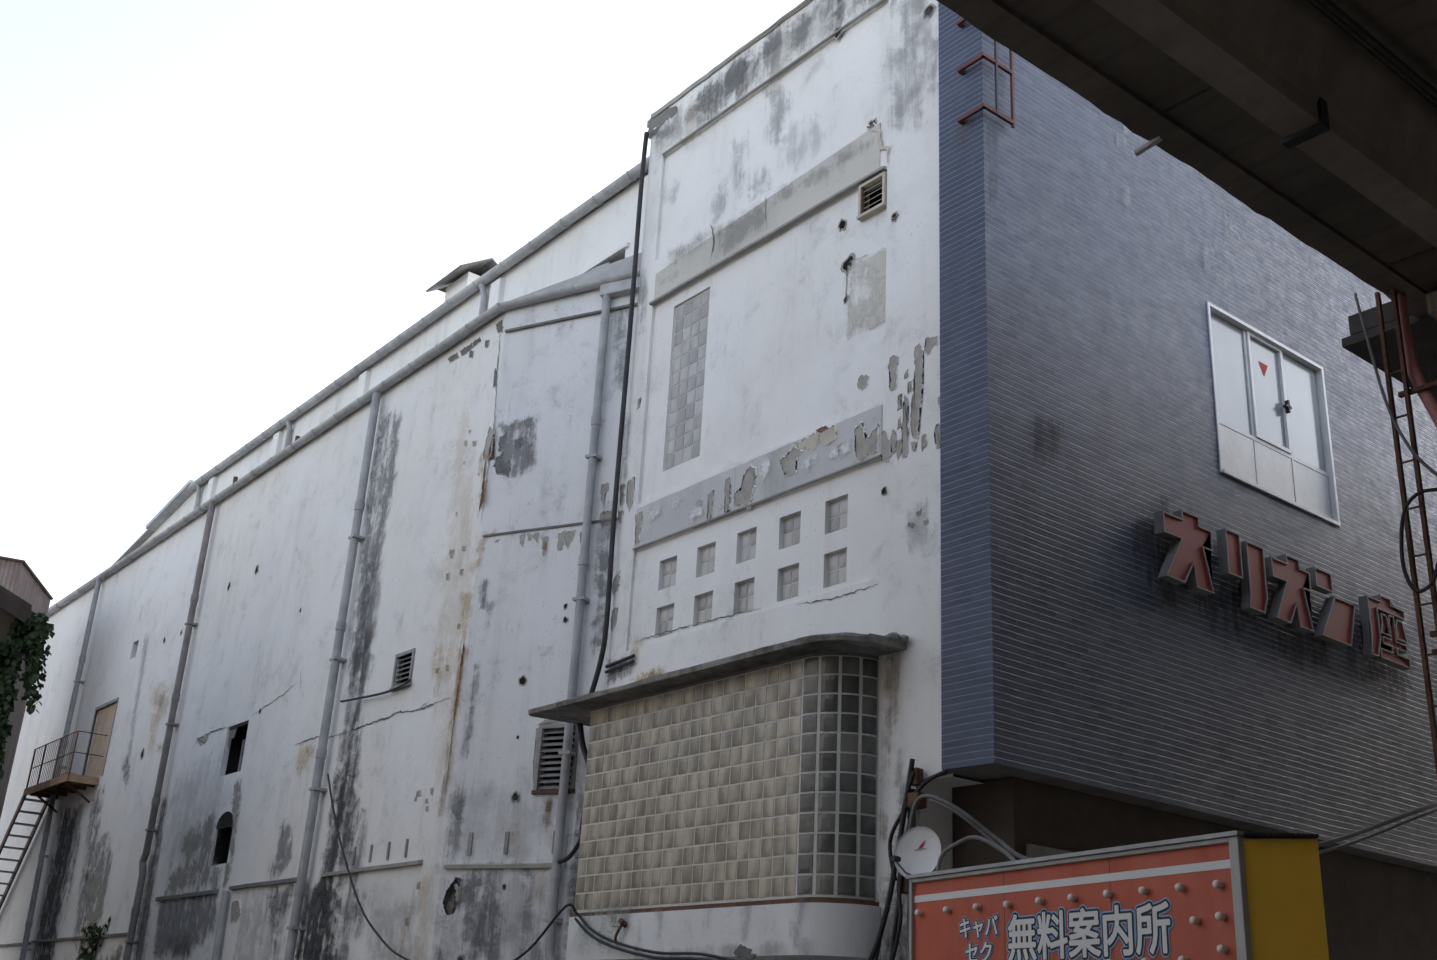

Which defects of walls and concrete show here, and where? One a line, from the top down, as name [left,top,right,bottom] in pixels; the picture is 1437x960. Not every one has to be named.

leakage [697,18,809,123]
spalling [840,252,856,276]
peeling [448,318,536,521]
peeling [599,335,940,545]
leakage [349,414,401,674]
peeling [519,529,582,551]
peeling [611,570,621,631]
crack [193,673,301,748]
crack [295,698,449,745]
leakage [33,789,111,960]
leakage [265,776,362,960]
spalling [443,877,469,915]